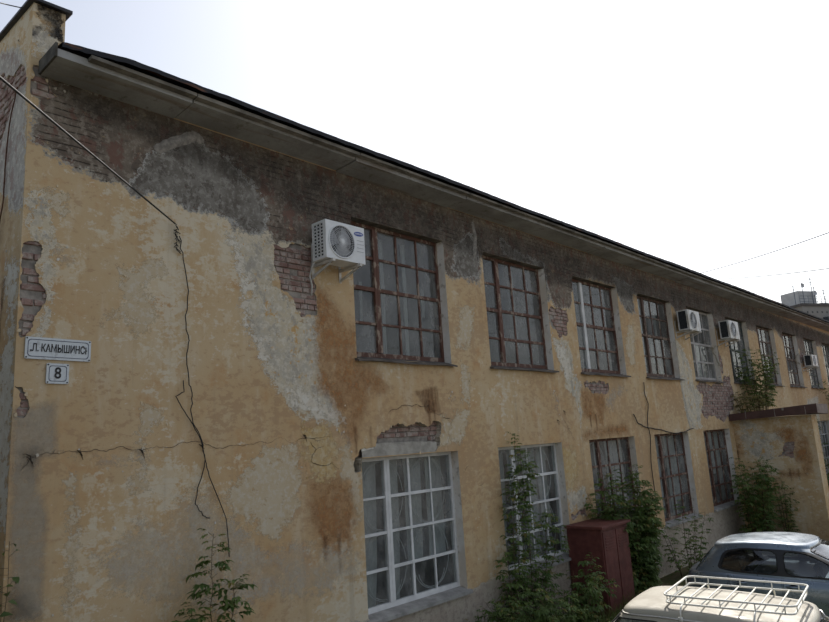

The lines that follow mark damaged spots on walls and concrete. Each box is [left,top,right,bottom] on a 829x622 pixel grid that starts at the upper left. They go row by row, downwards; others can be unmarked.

peeling [31,23,60,57]
spalling [0,39,829,430]
peeling [0,257,30,534]
crack [22,436,339,469]
peeling [221,408,470,542]
peeling [567,486,590,521]
spalling [651,504,745,579]
spalling [387,561,574,622]